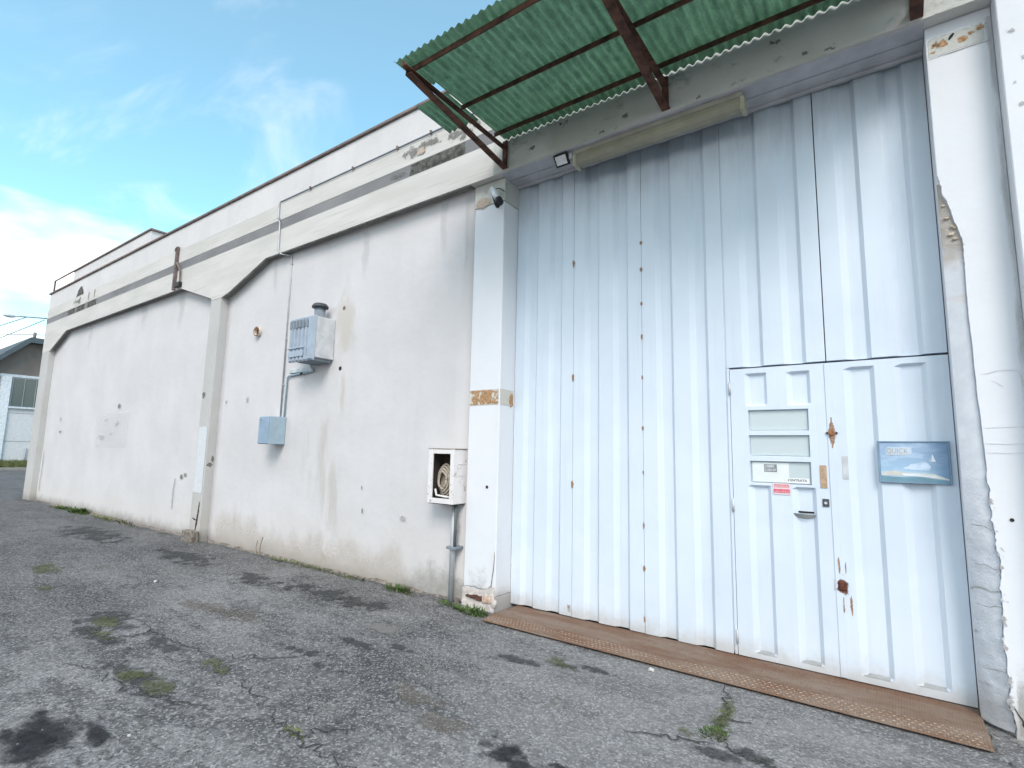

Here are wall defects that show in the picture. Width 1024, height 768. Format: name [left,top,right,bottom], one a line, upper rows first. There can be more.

corrosion [834,558,853,616]
spalling [937,184,1016,733]